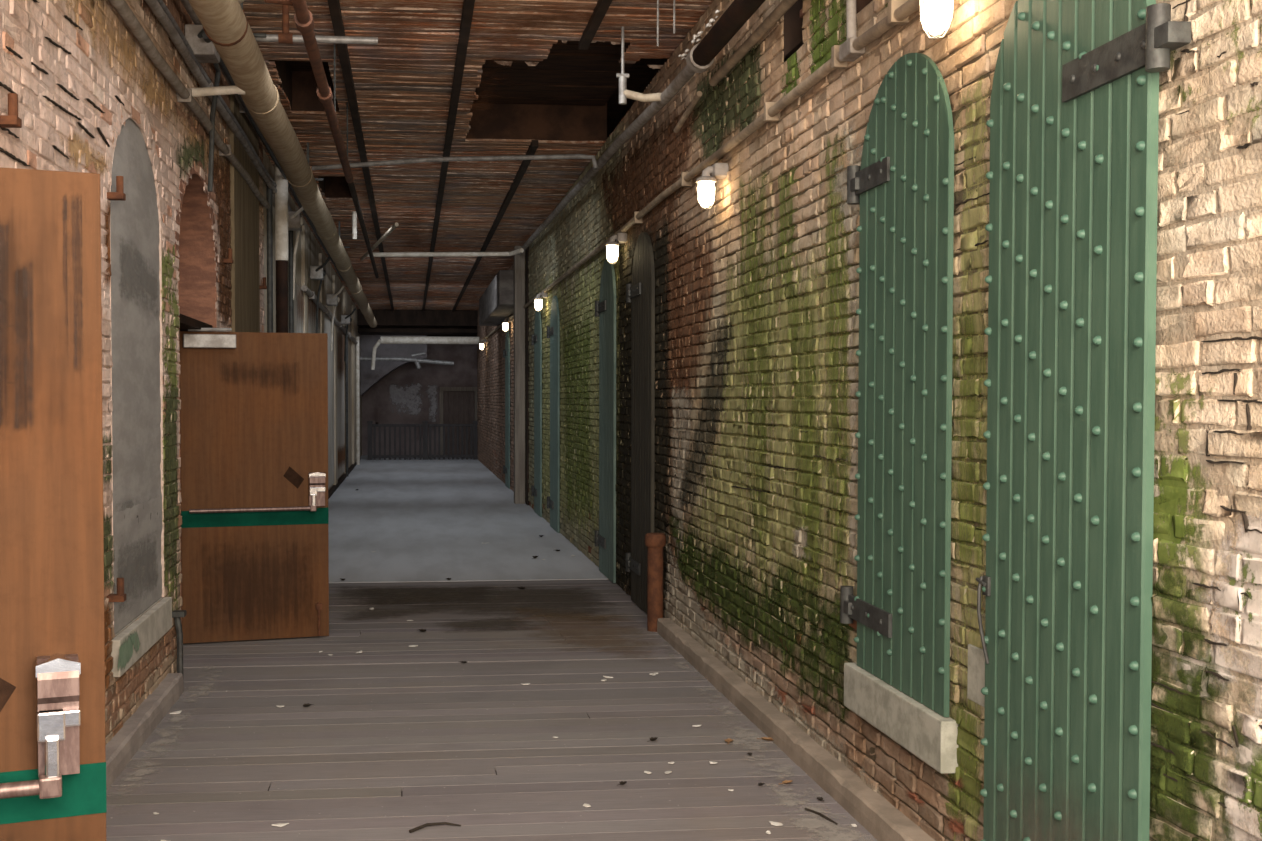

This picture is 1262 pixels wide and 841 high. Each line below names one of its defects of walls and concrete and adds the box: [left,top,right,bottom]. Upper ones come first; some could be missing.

damp [563,317,593,519]
damp [616,220,881,795]
damp [700,677,865,841]
damp [740,141,852,592]
damp [1177,517,1262,841]
crack [1192,583,1249,597]
crack [1201,336,1262,464]
crack [1220,506,1262,533]